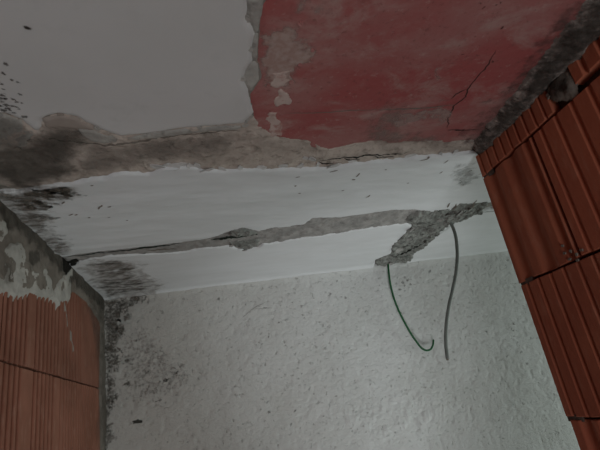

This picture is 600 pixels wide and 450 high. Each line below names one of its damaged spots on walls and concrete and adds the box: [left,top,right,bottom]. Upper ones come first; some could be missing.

peeling [0,0,474,189]
crack [318,50,496,131]
peeling [62,200,494,275]
water stain [98,262,146,444]